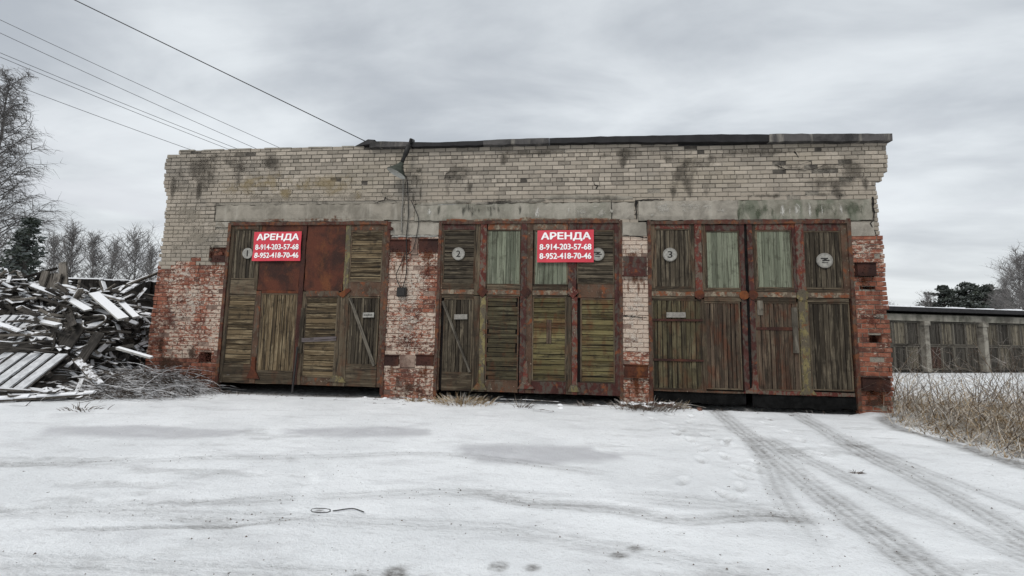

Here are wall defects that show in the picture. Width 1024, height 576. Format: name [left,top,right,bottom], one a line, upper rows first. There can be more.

crack [869,197,877,234]
spalling [160,284,209,341]
peeling [387,263,437,353]
spalling [863,310,886,342]
spalling [193,352,212,362]